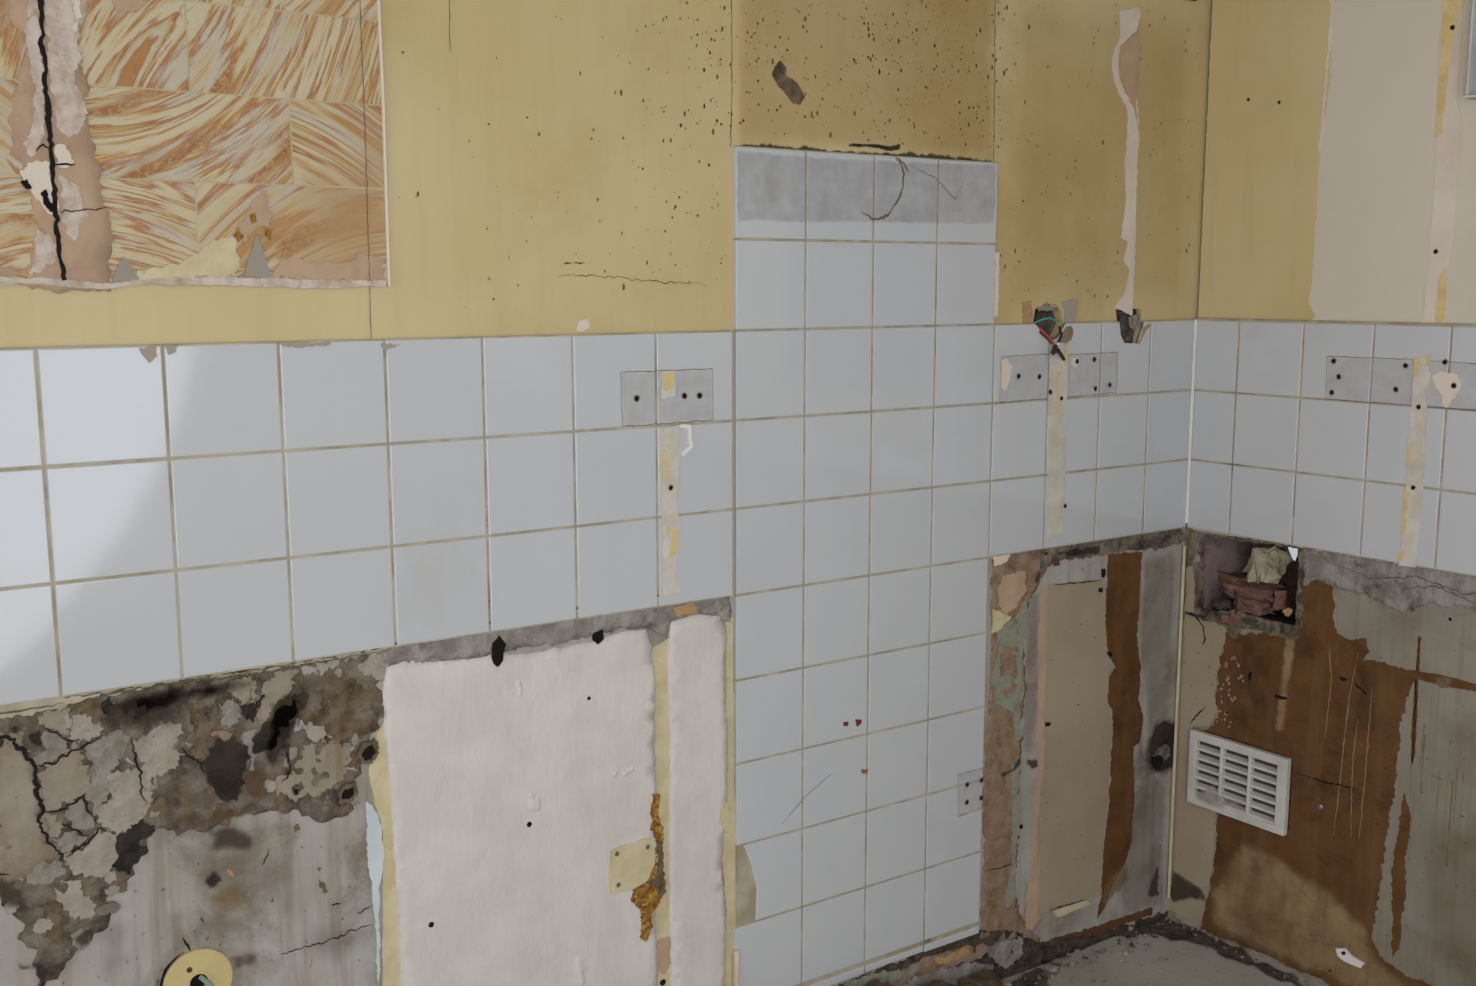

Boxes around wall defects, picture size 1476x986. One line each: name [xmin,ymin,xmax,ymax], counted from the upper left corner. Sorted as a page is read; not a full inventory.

peeling [19,0,89,276]
crack [21,0,106,281]
crack [0,728,148,861]
leakage [110,681,235,725]
crack [181,747,206,772]
spalling [0,651,389,986]
leakage [187,692,309,848]
flaking render [837,527,1433,986]